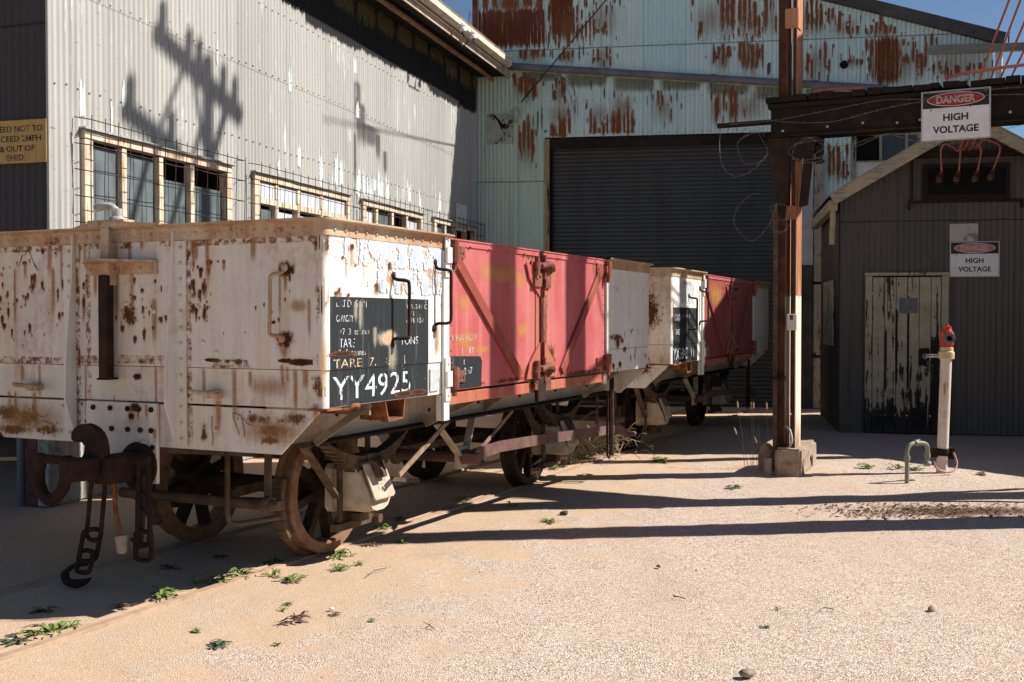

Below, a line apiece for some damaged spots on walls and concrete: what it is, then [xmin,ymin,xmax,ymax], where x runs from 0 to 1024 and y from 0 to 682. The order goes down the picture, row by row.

rust [468,0,621,139]
rust [712,0,777,75]
rust [803,0,993,86]
rust [518,114,537,169]
rust [586,86,682,136]
rust [827,138,858,180]
peeling [884,307,940,430]